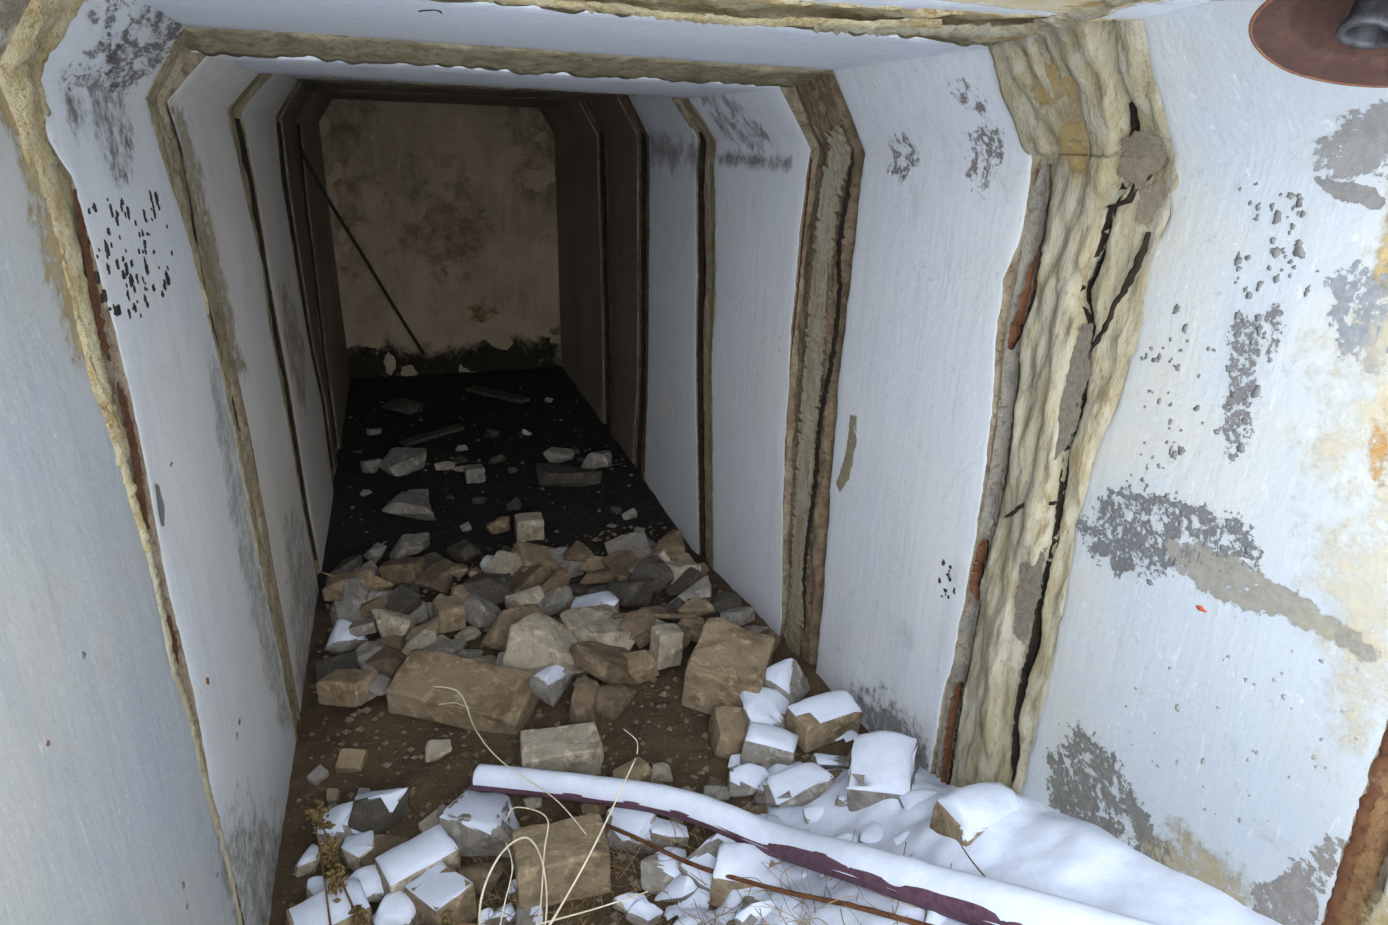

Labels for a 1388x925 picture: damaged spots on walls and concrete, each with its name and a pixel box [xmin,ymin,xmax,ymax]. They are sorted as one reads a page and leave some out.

leakage [943,0,1142,15]
corrosion [73,189,112,362]
leakage [66,75,173,319]
corrosion [117,383,150,530]
crack [1004,174,1152,782]
crack [1129,101,1140,137]
peeling [1075,389,1381,671]
peeling [1193,182,1307,463]
peeling [1313,99,1388,210]
leakage [1362,317,1388,434]
peeling [1250,833,1347,925]
corrosion [1321,725,1388,925]